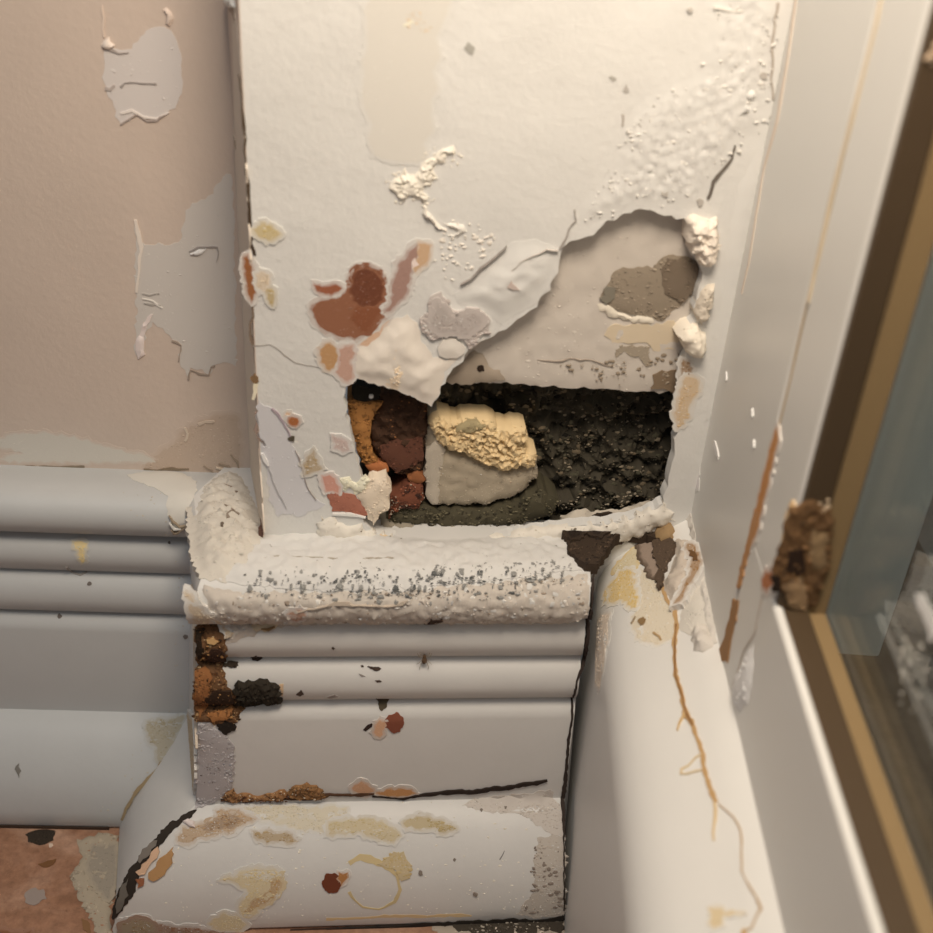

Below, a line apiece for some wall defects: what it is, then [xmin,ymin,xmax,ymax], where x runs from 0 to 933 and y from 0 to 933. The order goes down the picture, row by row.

peeling [101,8,183,125]
crack [238,75,256,256]
peeling [133,0,368,532]
spalling [599,254,699,321]
flaking render [355,314,673,520]
spalling [378,512,415,528]
rust [719,421,782,663]
peeling [194,722,236,809]
peeling [363,699,404,740]
crack [284,574,595,911]
crack [661,587,764,933]
peeling [322,868,352,893]